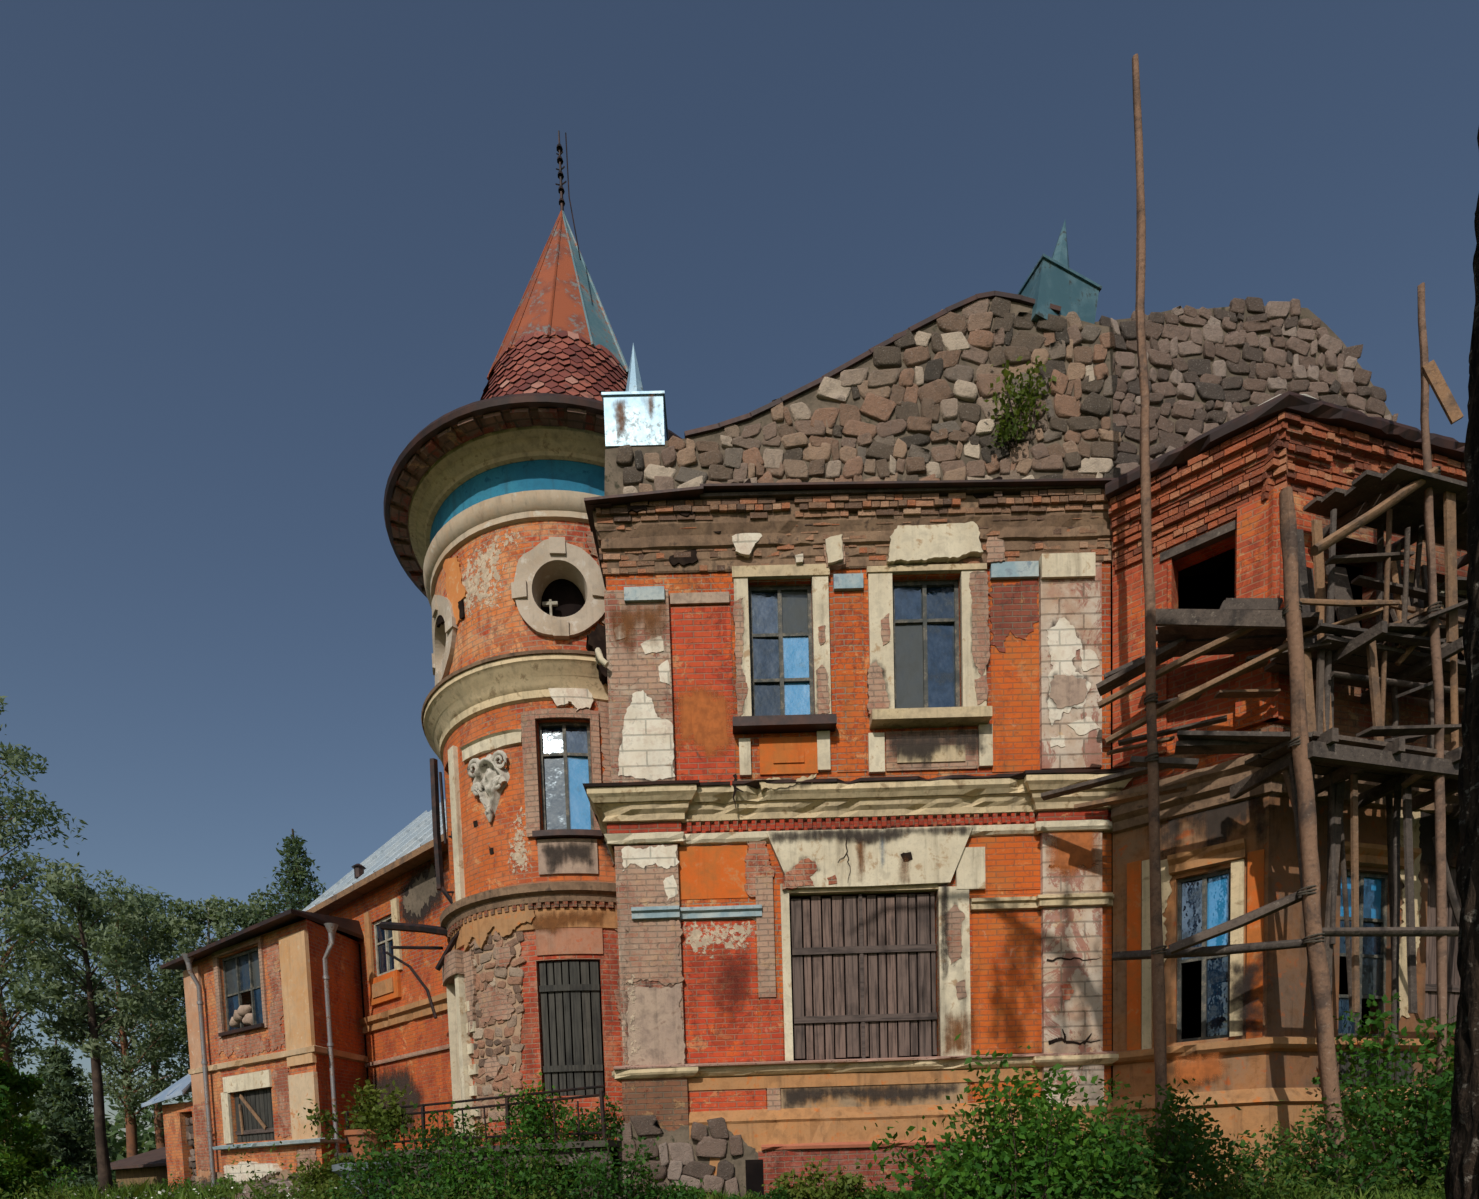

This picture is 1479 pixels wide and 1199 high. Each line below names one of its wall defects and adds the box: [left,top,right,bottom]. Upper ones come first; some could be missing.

peeling [436,523,523,628]
spalling [586,531,601,570]
spalling [669,549,698,567]
peeling [823,534,846,570]
peeling [548,613,624,712]
peeling [618,598,748,781]
peeling [886,521,1100,748]
peeling [744,841,837,898]
peeling [462,905,536,1036]
spalling [621,845,757,1066]
spalling [1061,982,1074,1002]
peeling [484,1056,502,1078]